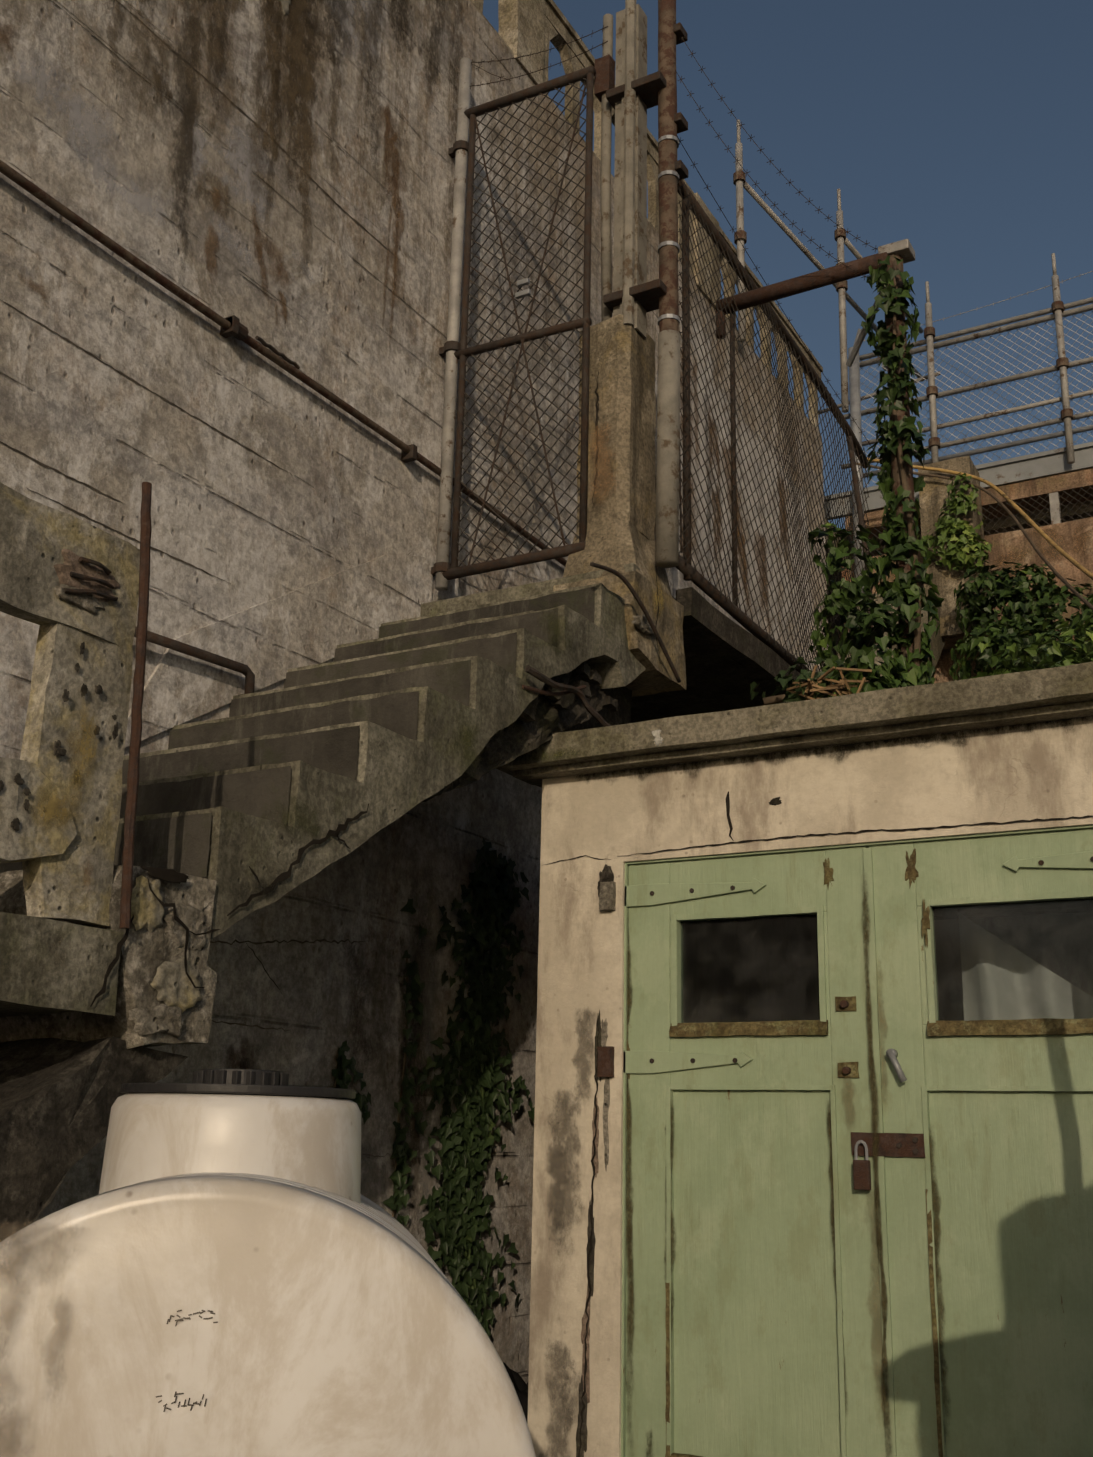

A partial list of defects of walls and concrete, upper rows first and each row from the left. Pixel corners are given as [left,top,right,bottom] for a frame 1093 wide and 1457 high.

corrosion [253,211,289,323]
corrosion [383,105,405,332]
corrosion [680,360,788,611]
spalling [53,549,120,615]
spalling [428,660,618,798]
peeling [129,866,207,1038]
crack [90,804,369,1031]
leakage [548,1011,593,1244]
leakage [547,1346,578,1457]